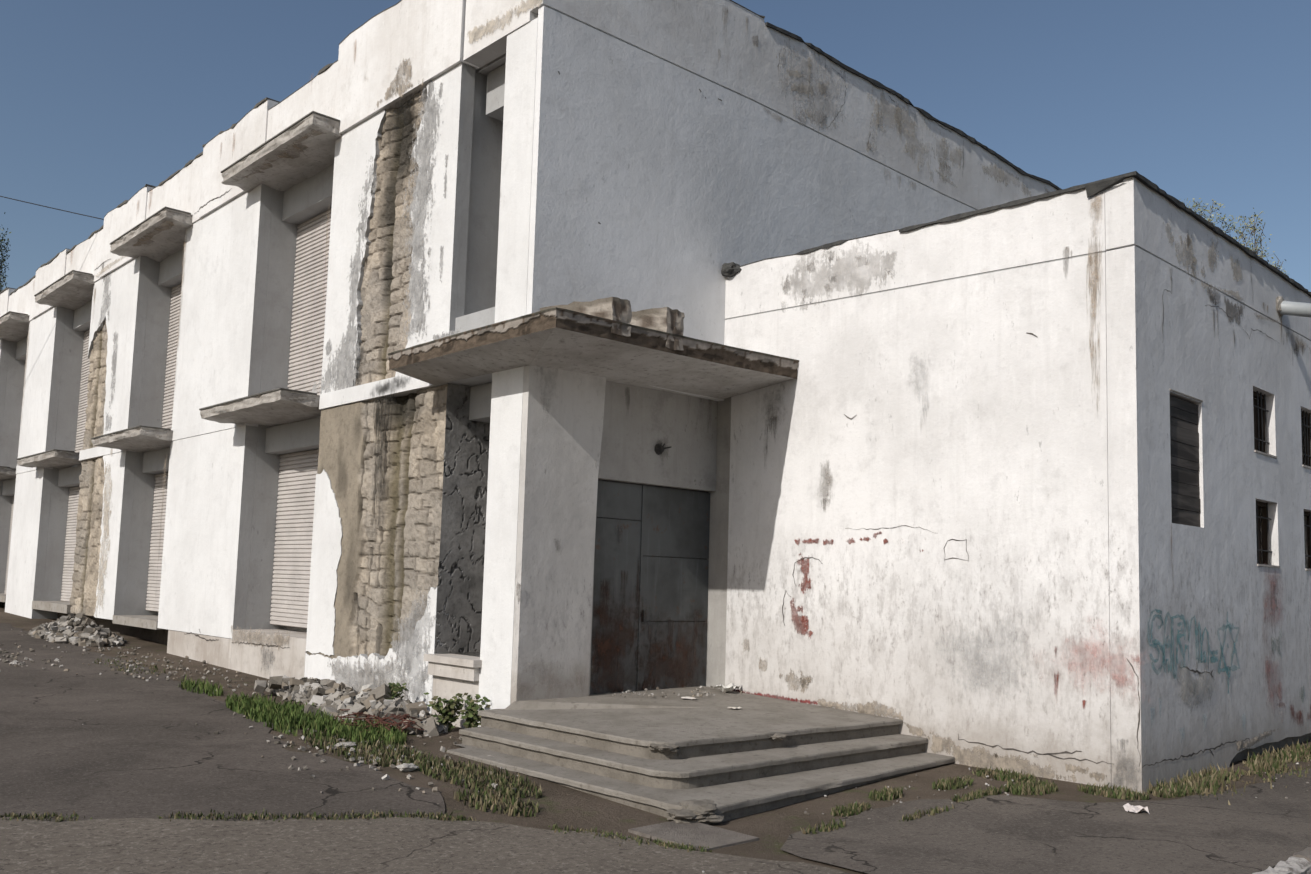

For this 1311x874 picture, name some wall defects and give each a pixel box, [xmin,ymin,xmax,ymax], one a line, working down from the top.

flaking render [69,221,174,616]
flaking render [307,58,799,702]
corrosion [590,591,707,693]
peeling [759,659,810,692]
crack [958,658,1249,768]